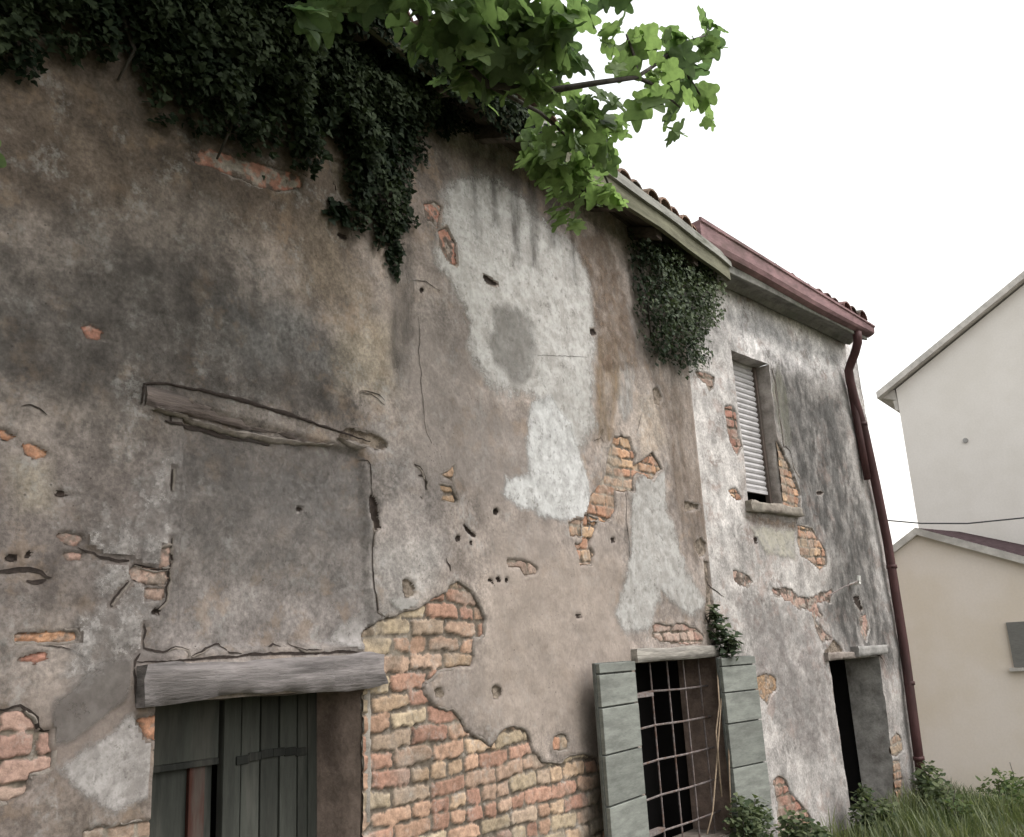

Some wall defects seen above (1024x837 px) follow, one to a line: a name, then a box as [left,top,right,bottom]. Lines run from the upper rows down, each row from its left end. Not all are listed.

spalling [191,146,302,194]
peeling [423,174,715,646]
spalling [724,406,743,456]
crack [169,469,177,491]
flaking render [129,543,174,615]
crack [372,531,385,617]
spalling [797,525,827,571]
crack [78,538,359,701]
spalling [772,587,842,653]
spalling [361,579,604,837]
peeling [0,711,155,811]
spalling [773,775,812,834]